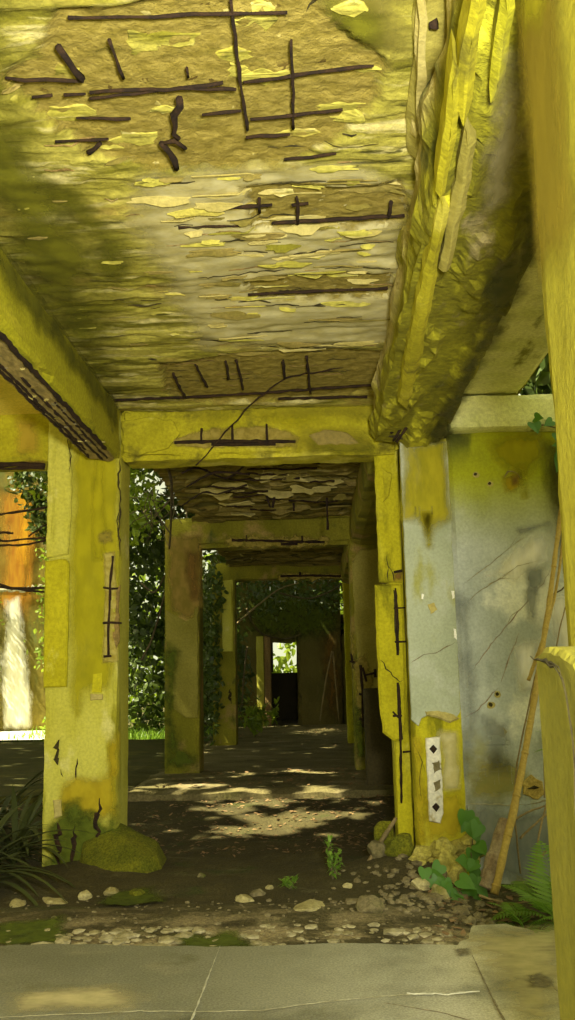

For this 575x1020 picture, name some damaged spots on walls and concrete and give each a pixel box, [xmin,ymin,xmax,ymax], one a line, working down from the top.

peeling [397,0,515,409]
spalling [0,0,408,701]
damp [549,447,559,510]
peeling [166,607,199,718]
peeling [278,427,460,803]
damp [504,527,543,618]
damp [519,645,534,687]
damp [553,598,568,646]
damp [416,707,473,837]
damp [475,807,551,883]
crack [0,991,480,1020]